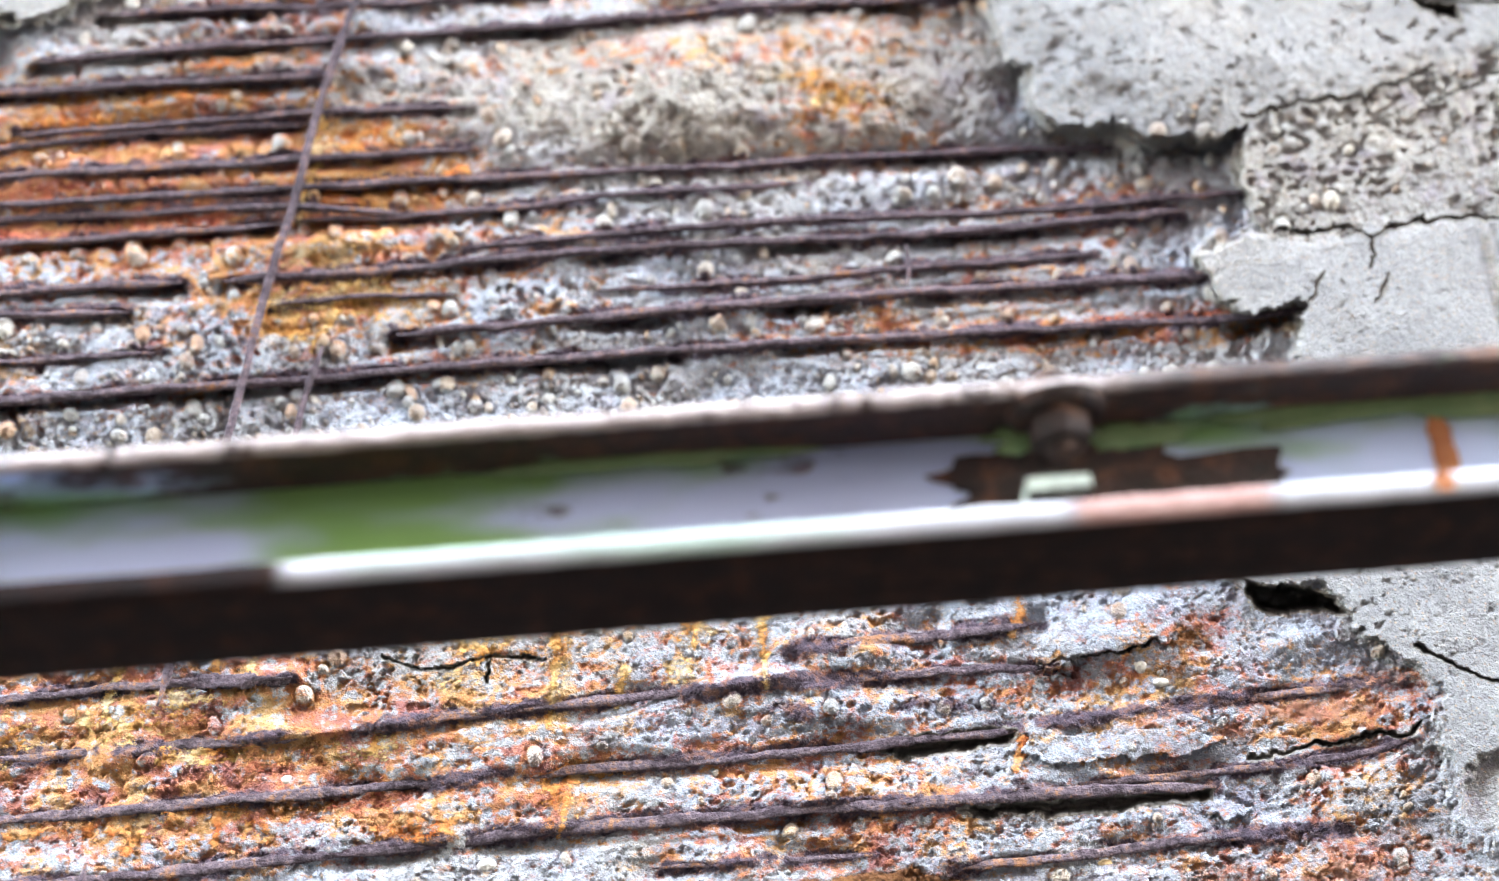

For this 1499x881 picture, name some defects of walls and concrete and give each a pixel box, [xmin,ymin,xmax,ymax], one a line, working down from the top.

crack [1240,61,1499,120]
rust [0,91,493,355]
spalling [0,0,1499,457]
peeling [471,447,823,478]
rust [924,443,1291,511]
rust [432,640,529,707]
rust [1146,622,1220,679]
crack [1413,641,1499,684]
rust [0,663,409,776]
spalling [0,578,1499,881]
rust [0,798,288,860]
rust [803,862,962,881]